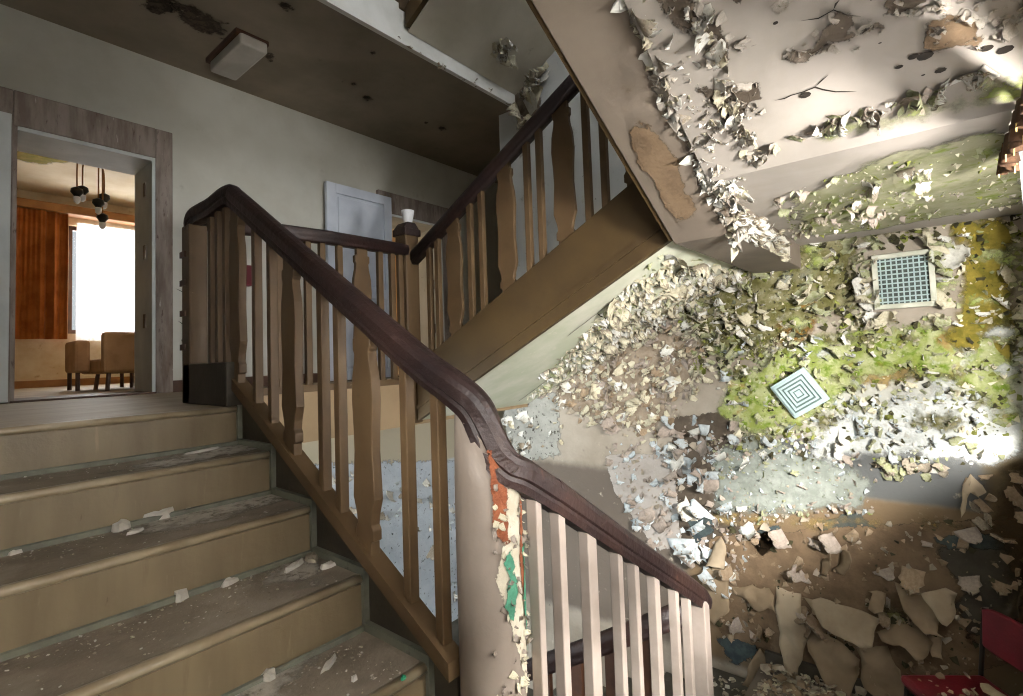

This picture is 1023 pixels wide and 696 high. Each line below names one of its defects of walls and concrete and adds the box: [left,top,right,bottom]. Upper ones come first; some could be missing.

peeling [490,37,550,129]
crack [778,75,855,100]
damp [789,132,1022,235]
peeling [501,0,1023,696]
damp [777,302,817,343]
peeling [486,450,533,696]